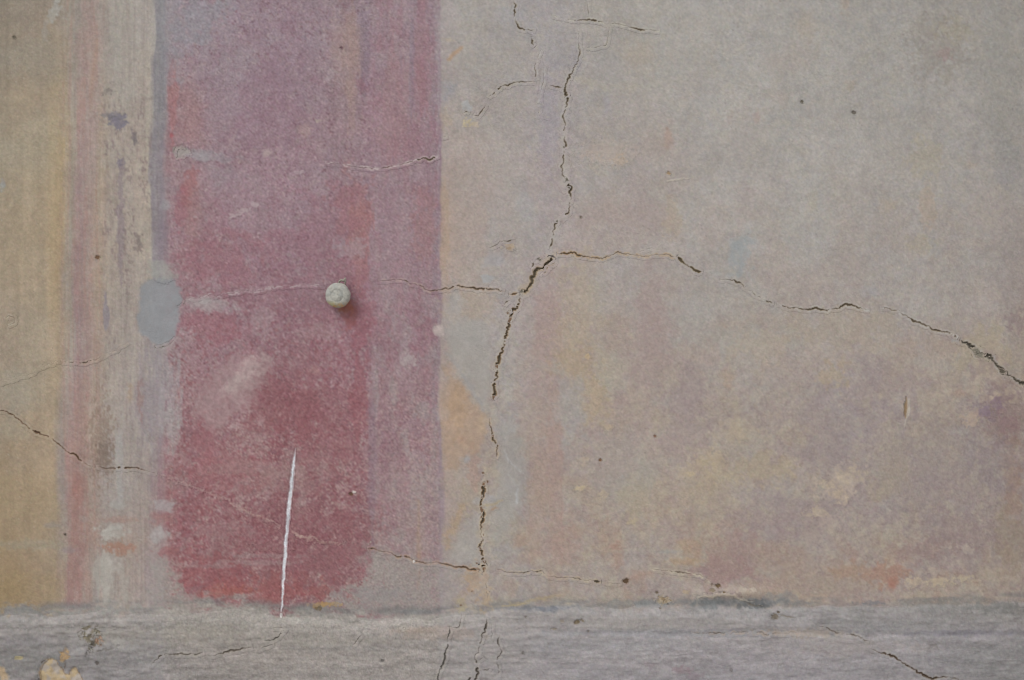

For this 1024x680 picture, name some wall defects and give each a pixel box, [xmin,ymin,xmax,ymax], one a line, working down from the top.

crack [186,281,327,302]
crack [325,0,1024,680]
crack [0,407,158,477]